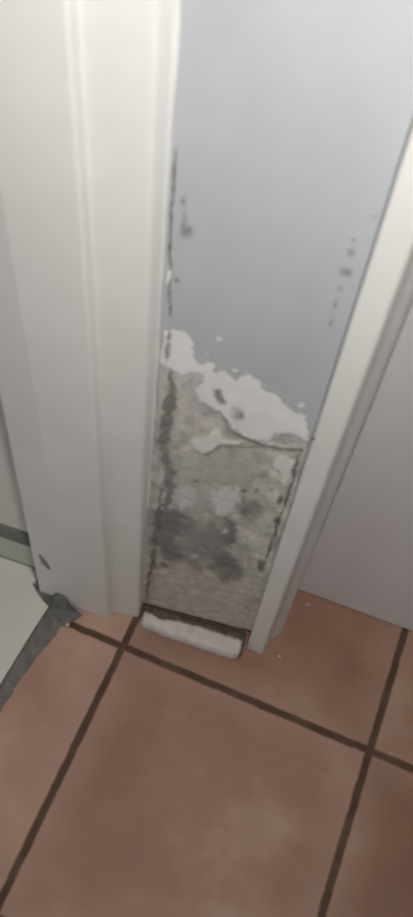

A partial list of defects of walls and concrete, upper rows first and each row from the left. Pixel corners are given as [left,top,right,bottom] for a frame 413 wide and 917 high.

leakage [146,372,186,598]
spalling [143,328,310,631]